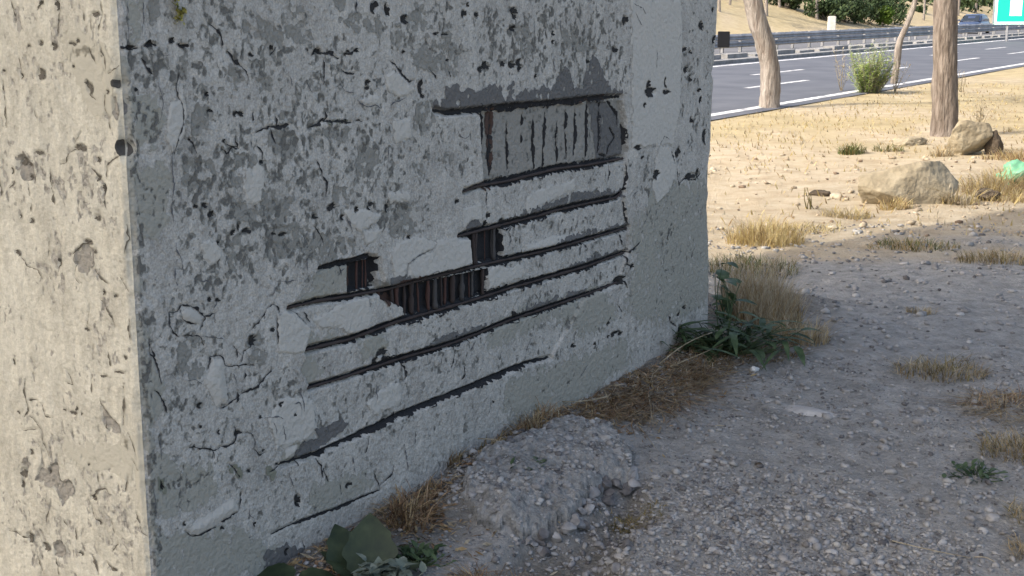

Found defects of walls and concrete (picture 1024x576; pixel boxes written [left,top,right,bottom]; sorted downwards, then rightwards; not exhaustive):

rust [485,107,494,168]
rust [462,157,624,193]
crack [0,0,451,538]
spalling [0,0,716,576]
rust [286,227,627,309]
rust [305,252,625,389]